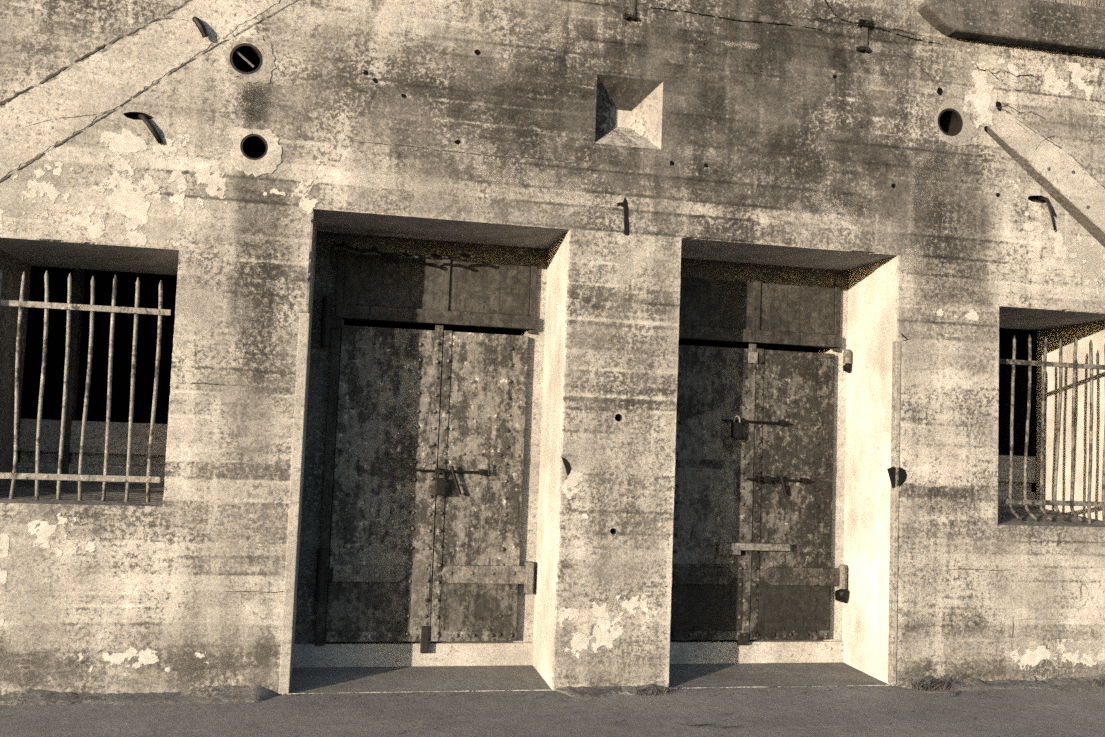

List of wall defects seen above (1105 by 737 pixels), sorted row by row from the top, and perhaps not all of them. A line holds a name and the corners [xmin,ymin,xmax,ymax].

crack [575,0,943,76]
peeling [957,49,1032,129]
peeling [1044,62,1105,100]
peeling [0,112,227,246]
peeling [1023,195,1105,295]
peeling [0,525,9,584]
peeling [24,513,82,557]
peeling [558,589,661,659]
peeling [75,646,171,676]
spalling [992,639,1105,681]